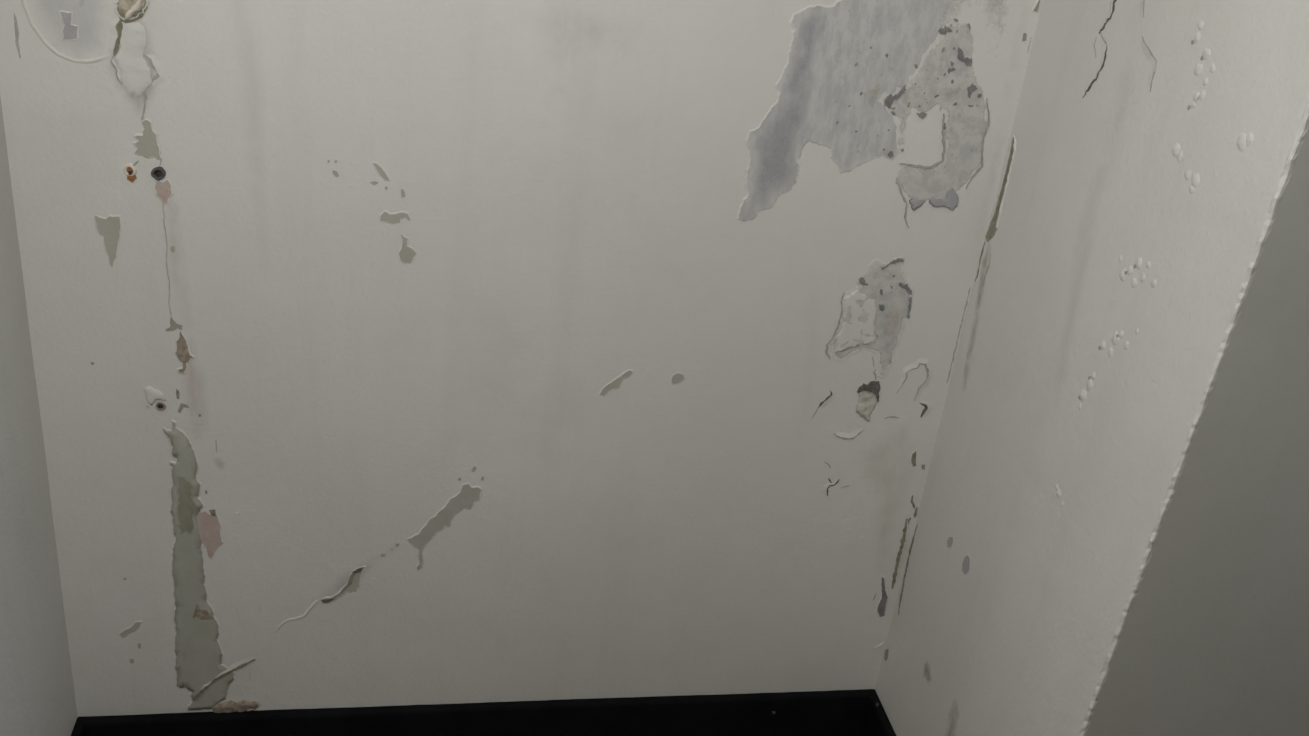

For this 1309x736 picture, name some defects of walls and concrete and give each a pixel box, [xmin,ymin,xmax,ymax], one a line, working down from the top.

flaking render [114,0,150,23]
crack [1082,0,1157,98]
peeling [737,0,990,228]
peeling [94,214,123,269]
peeling [370,161,417,264]
peeling [985,135,1016,244]
peeling [598,369,634,396]
flaking render [826,257,914,422]
peeling [158,317,261,713]
peeling [381,466,484,571]
peeling [320,565,366,604]
peeling [873,575,889,618]